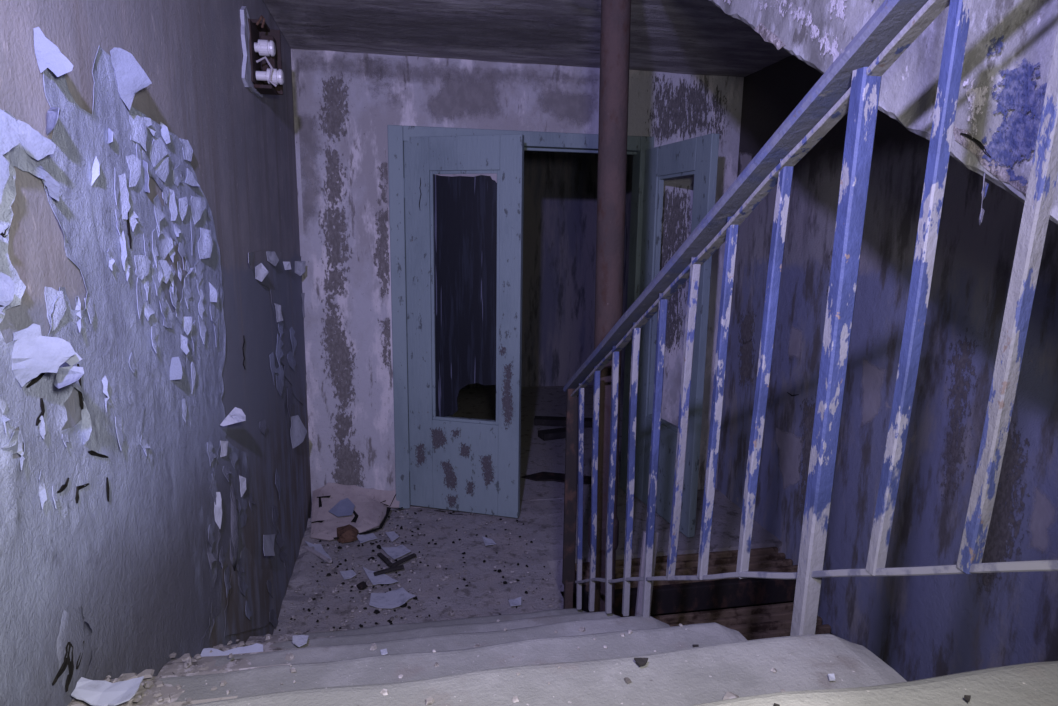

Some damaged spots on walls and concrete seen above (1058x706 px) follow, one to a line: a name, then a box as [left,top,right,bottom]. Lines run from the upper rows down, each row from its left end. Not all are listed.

damp [428,78,498,118]
damp [540,91,594,122]
spalling [754,23,786,50]
peeling [986,33,1004,59]
peeling [953,58,1047,226]
peeling [0,27,288,706]
peeling [248,250,307,448]
damp [299,73,365,487]
damp [373,162,390,298]
damp [378,318,391,367]